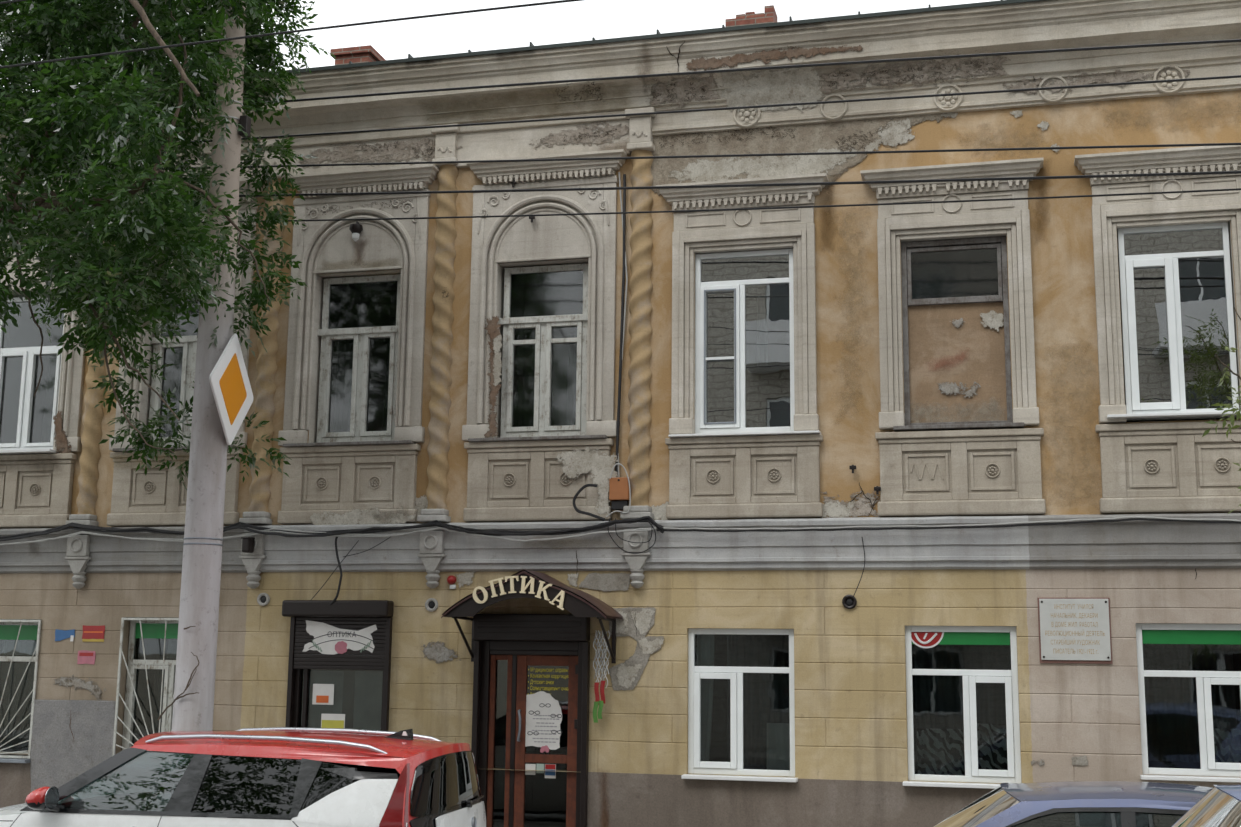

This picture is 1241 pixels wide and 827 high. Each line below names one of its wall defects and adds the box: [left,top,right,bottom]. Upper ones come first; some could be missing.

peeling [529,121,629,150]
peeling [648,44,1191,196]
flaking render [484,316,503,438]
peeling [556,446,618,514]
peeling [822,486,881,518]
peeling [567,573,631,592]
peeling [420,638,461,664]
spalling [609,607,665,691]